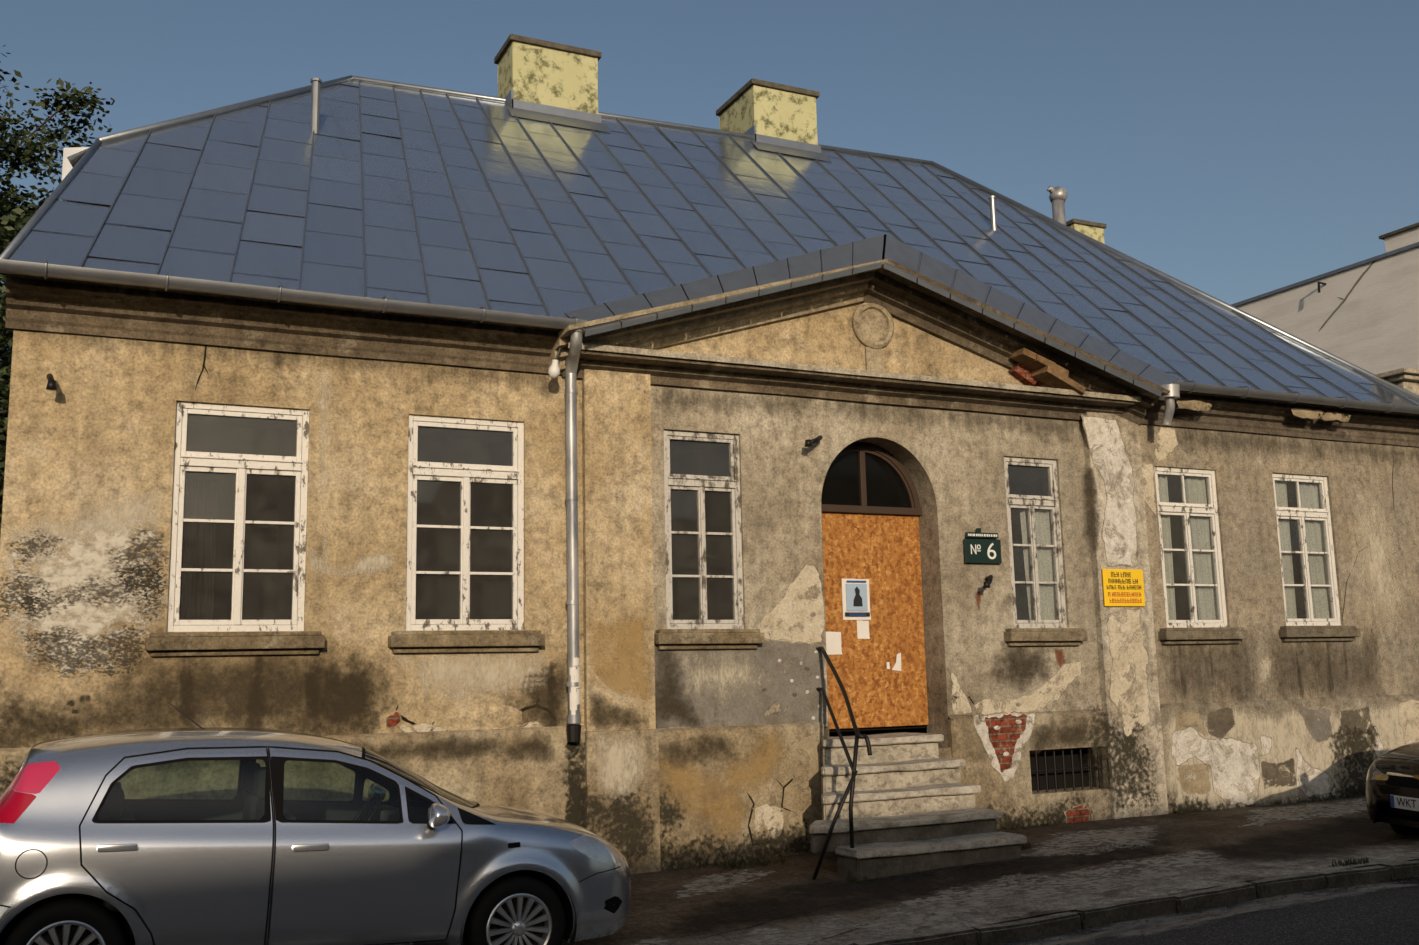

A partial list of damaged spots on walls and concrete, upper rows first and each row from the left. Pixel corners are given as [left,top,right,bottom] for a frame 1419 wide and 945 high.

crack [195,345,209,390]
peeling [1081,414,1179,568]
peeling [757,563,826,697]
spalling [949,660,1083,783]
peeling [1107,607,1151,737]
peeling [1171,705,1336,806]
water stain [1274,725,1378,805]
peeling [1299,699,1419,759]